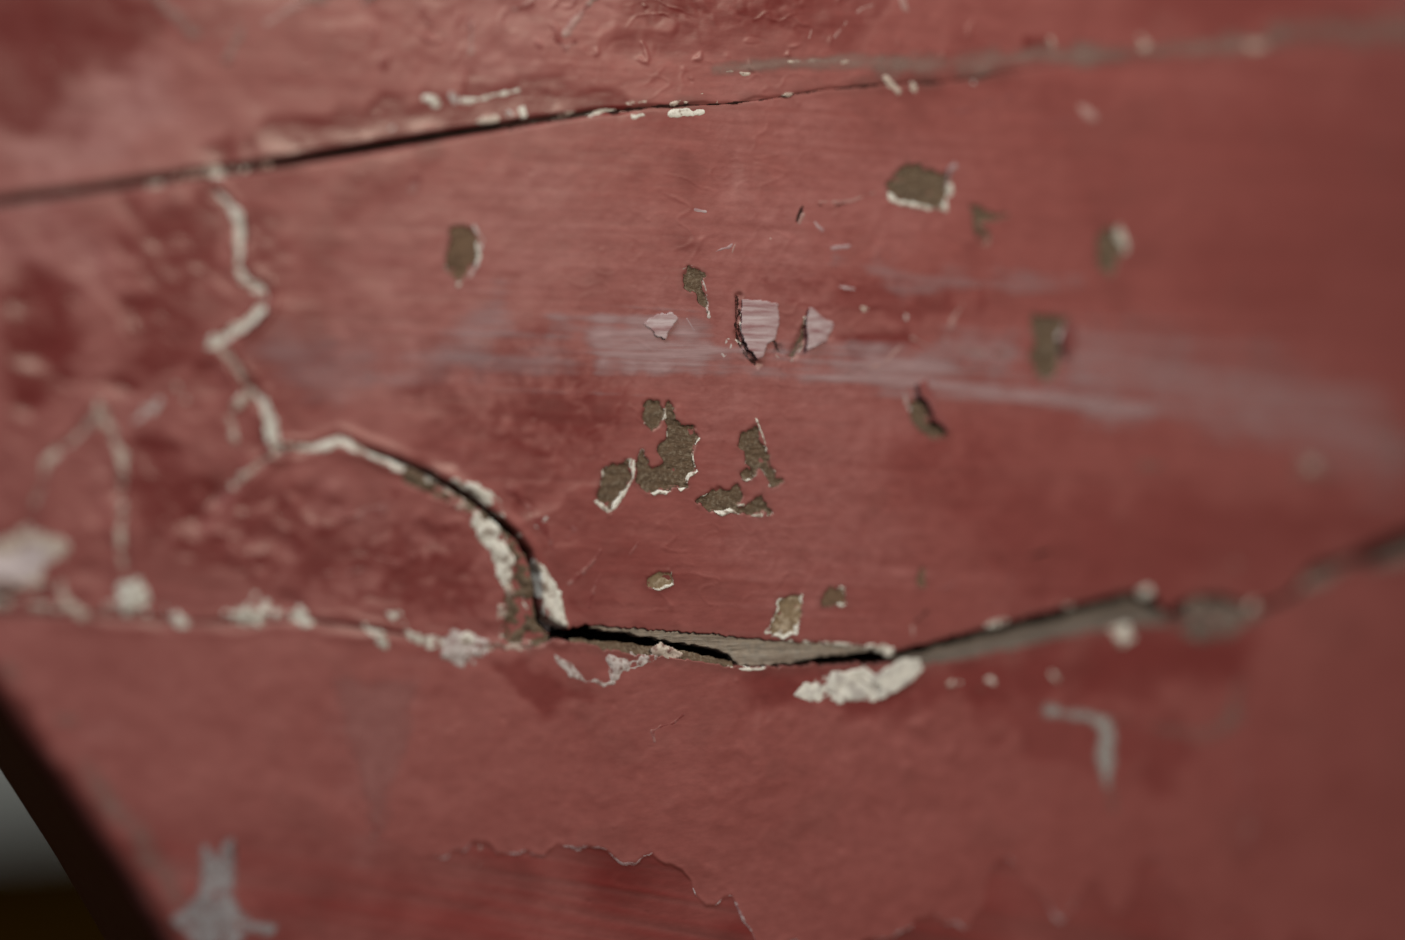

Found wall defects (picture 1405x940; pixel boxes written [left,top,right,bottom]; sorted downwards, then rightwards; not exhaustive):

peeling [887,162,958,212]
peeling [445,225,484,287]
crack [0,73,1264,671]
peeling [644,265,711,339]
peeling [721,294,834,365]
peeling [1029,313,1076,381]
peeling [904,379,949,439]
peeling [594,400,784,517]
crack [1295,531,1405,595]
peeling [764,594,803,639]
peeling [794,658,923,704]